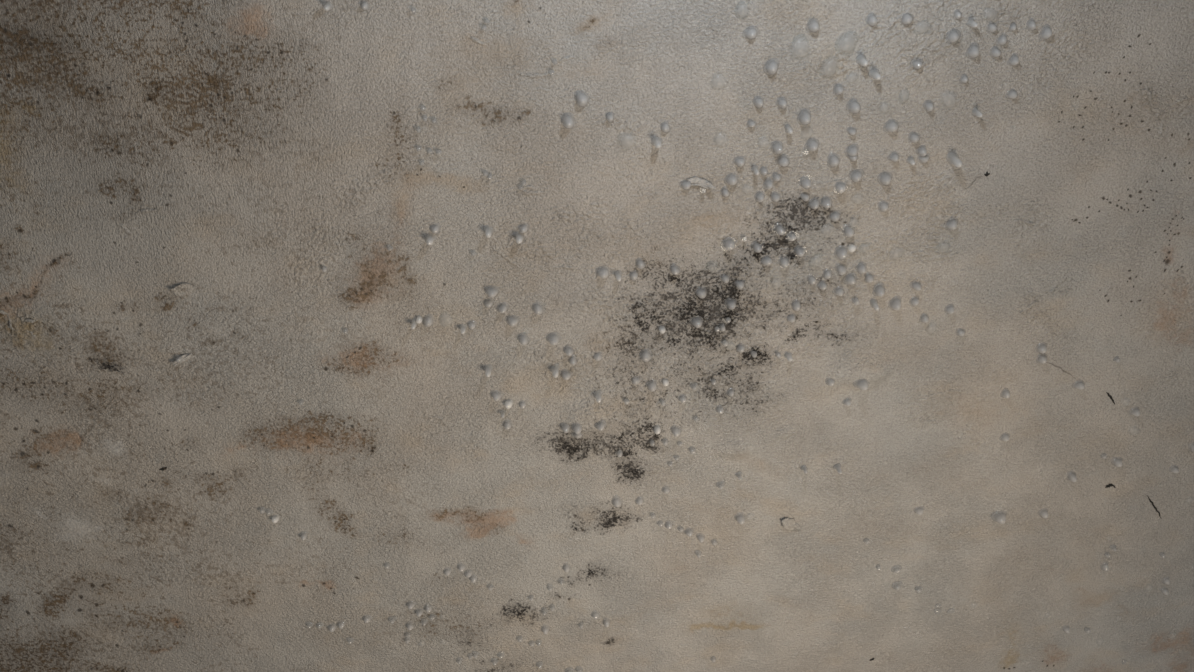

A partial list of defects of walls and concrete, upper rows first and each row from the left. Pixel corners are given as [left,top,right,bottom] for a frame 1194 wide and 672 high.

water stain [0,0,328,167]
water stain [537,197,853,483]